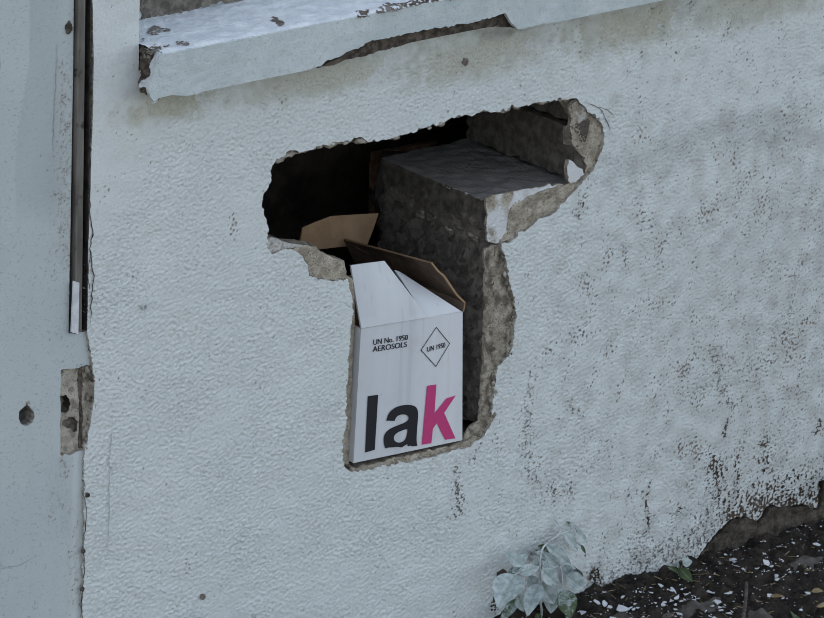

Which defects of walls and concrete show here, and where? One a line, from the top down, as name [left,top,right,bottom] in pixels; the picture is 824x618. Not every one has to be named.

peeling [356,0,439,18]
peeling [138,0,239,104]
spalling [317,43,408,68]
spalling [275,137,367,164]
flaking render [267,234,347,280]
flaking render [345,98,603,471]
spalling [60,365,100,453]
leakage [700,449,741,541]
peeling [700,480,824,556]